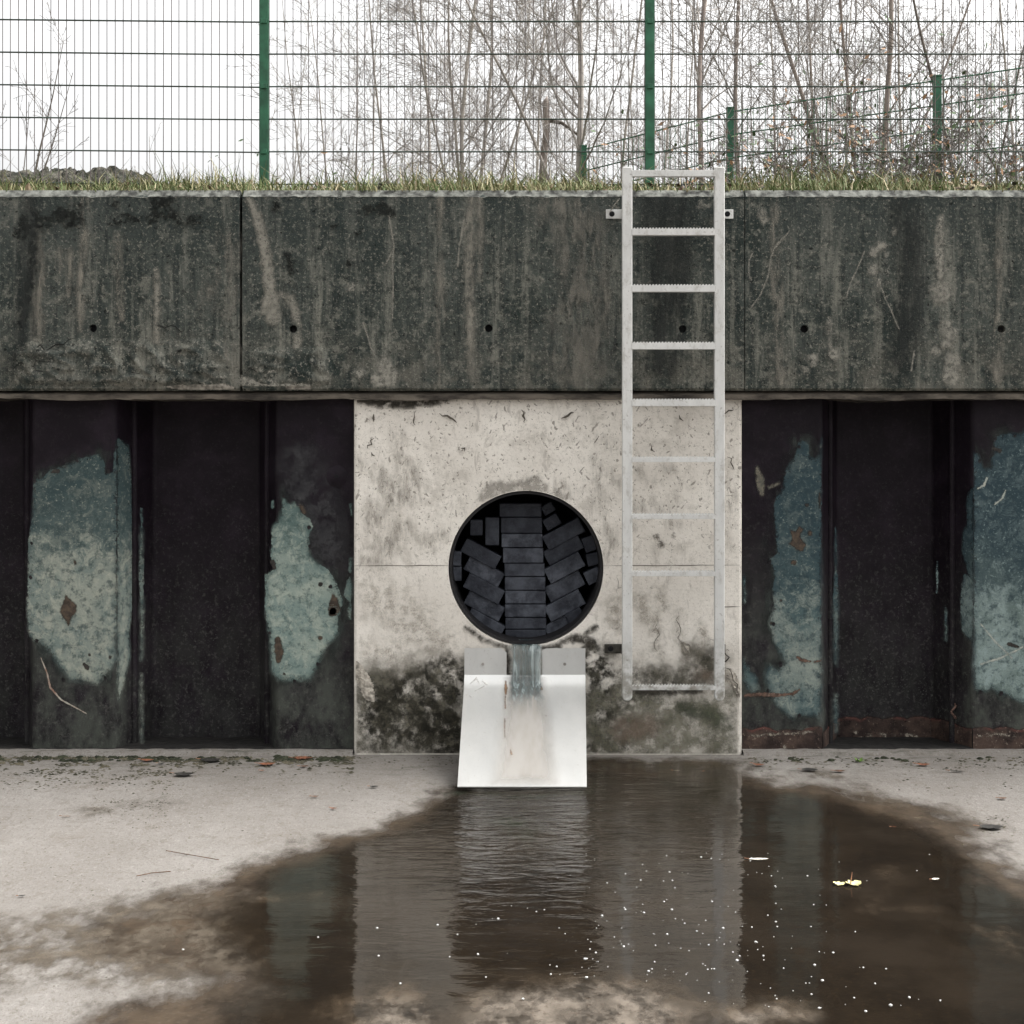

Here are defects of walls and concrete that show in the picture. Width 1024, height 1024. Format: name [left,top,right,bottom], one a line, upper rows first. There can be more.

water stain [237,363,304,386]
water stain [247,197,301,349]
water stain [356,358,397,387]
water stain [465,197,483,376]
water stain [644,197,689,375]
water stain [869,198,950,371]
peeling [27,438,144,696]
peeling [264,489,352,683]
peeling [725,438,839,721]
peeling [960,427,1024,703]
water stain [0,592,1024,1024]
rust [742,703,1024,753]